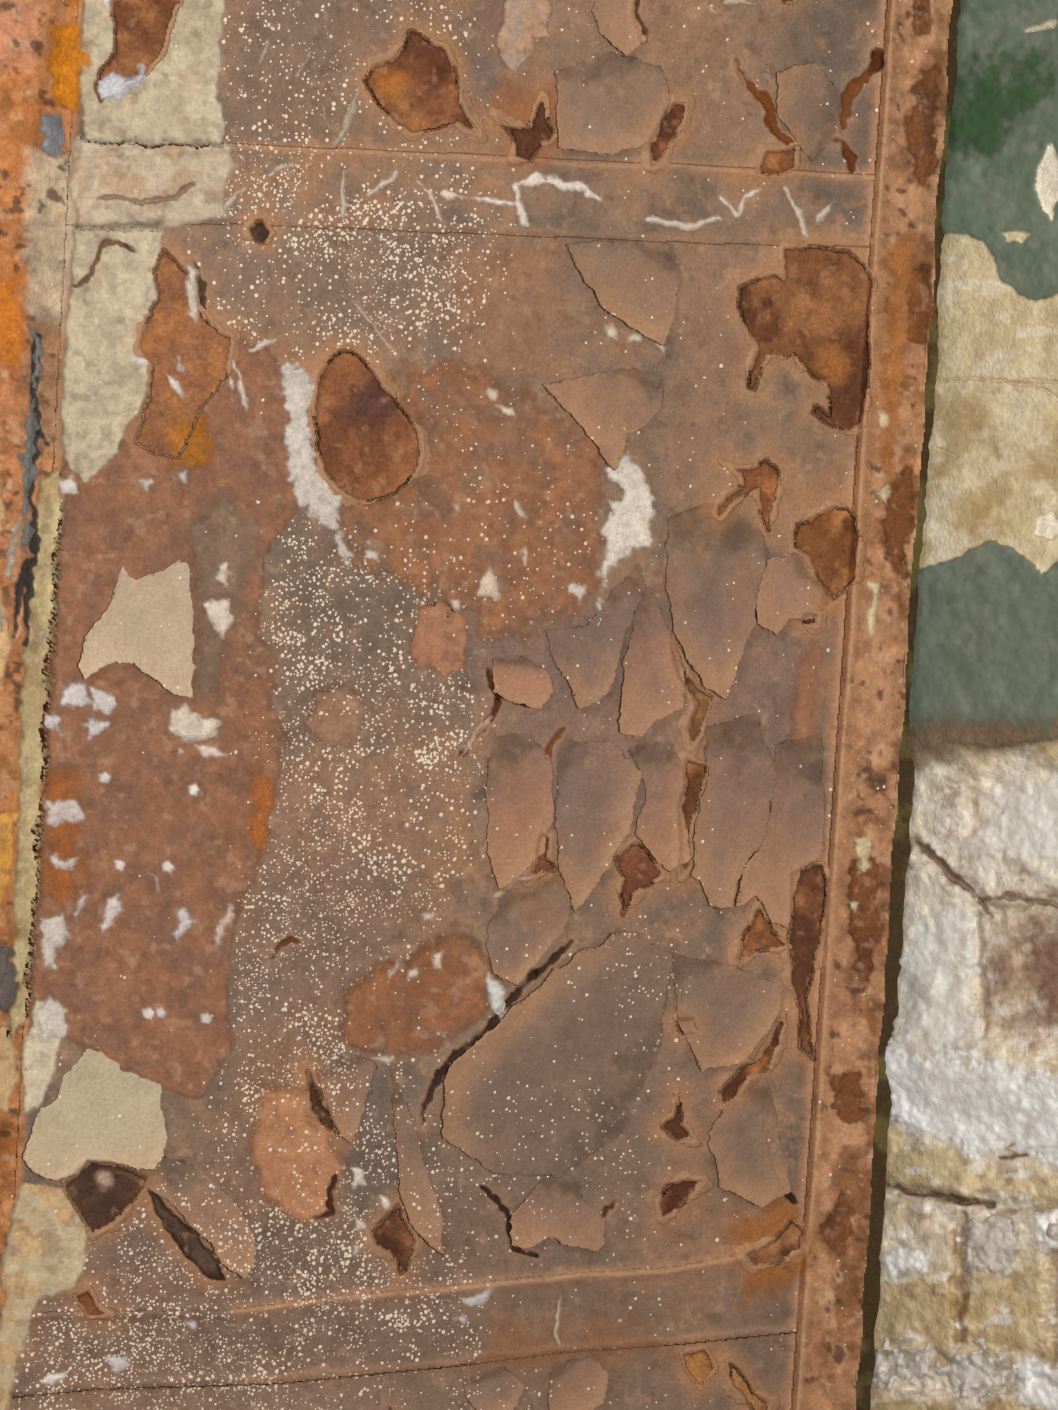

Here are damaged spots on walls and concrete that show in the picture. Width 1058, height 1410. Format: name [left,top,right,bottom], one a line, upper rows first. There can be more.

peeling [941,0,1058,300]
corrosion [0,279,24,366]
peeling [737,242,878,436]
corrosion [881,238,915,471]
peeling [0,0,298,1410]
peeling [909,540,1058,742]
peeling [249,349,866,1275]
crack [422,940,573,1122]
crack [317,1174,337,1219]
crack [480,1186,539,1258]
corrosion [739,1202,796,1243]
crack [785,1192,797,1204]